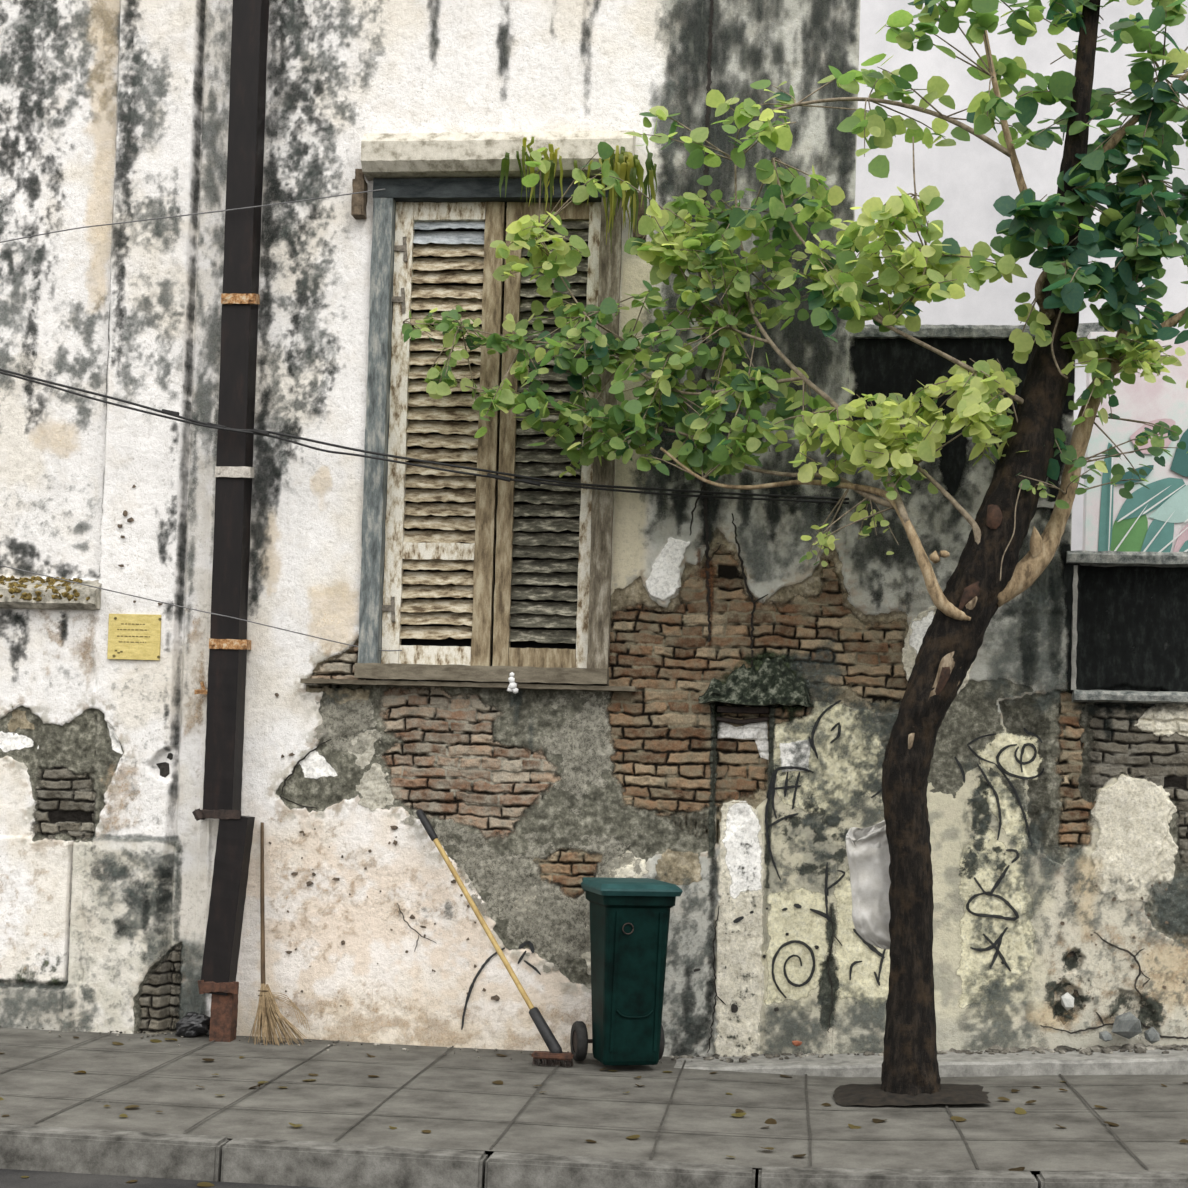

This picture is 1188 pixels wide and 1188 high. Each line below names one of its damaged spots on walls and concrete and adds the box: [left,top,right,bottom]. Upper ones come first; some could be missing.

water stain [428,0,440,58]
water stain [497,5,511,97]
water stain [248,0,382,613]
water stain [634,0,1034,612]
water stain [0,538,99,578]
water stain [158,449,196,563]
flaking render [0,706,124,842]
flaking render [275,529,937,1057]
flaking render [927,647,1188,1009]
water stain [959,763,1188,1030]
flaking render [133,942,183,1034]
water stain [727,903,886,1055]